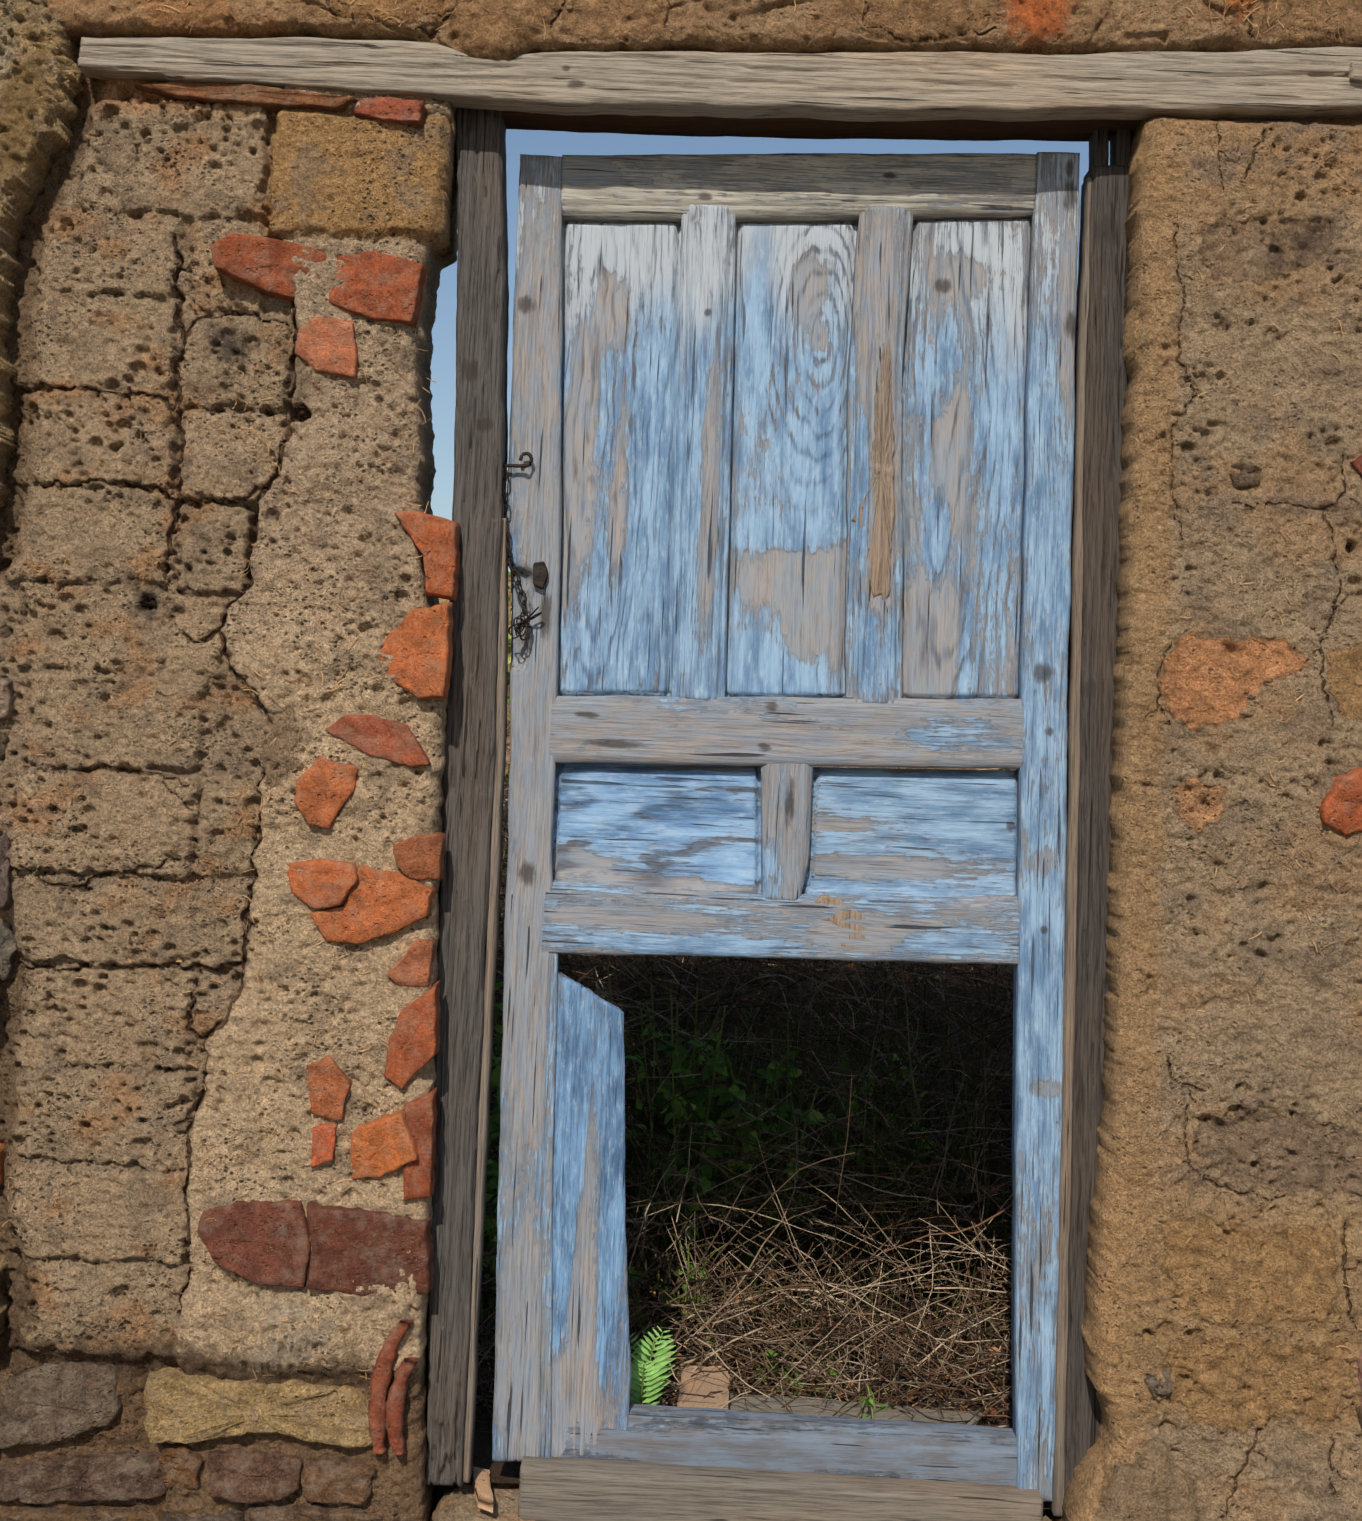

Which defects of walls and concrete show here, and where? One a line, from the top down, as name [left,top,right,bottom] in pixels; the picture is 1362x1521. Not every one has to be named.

crack [326,0,353,20]
crack [415,0,461,37]
crack [550,0,567,28]
crack [861,0,1000,45]
crack [1247,0,1256,37]
crack [1210,119,1277,190]
crack [1170,207,1211,540]
crack [23,236,298,713]
crack [1232,454,1360,726]
crack [1145,641,1172,728]
crack [23,764,200,813]
crack [18,775,266,1315]